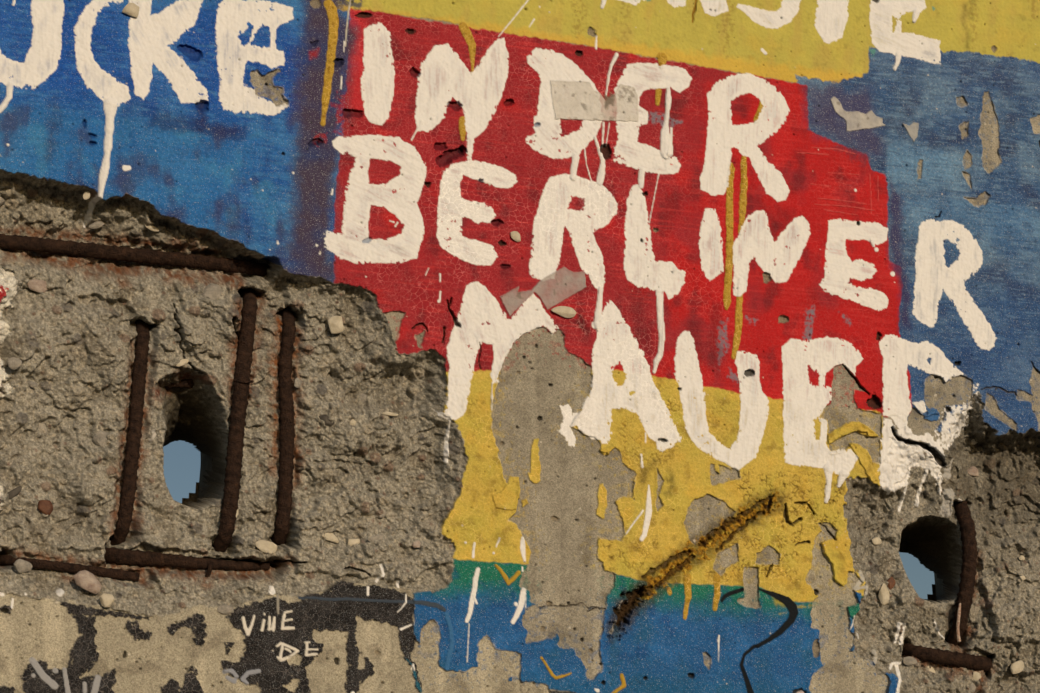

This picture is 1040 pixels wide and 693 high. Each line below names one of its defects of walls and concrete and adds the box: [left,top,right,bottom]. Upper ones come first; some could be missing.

peeling [960,92,1002,207]
peeling [1030,115,1040,147]
rust [0,225,222,256]
rust [2,248,306,541]
spalling [0,170,637,693]
crack [891,426,947,468]
peeling [656,470,664,512]
peeling [684,464,740,546]
spalling [793,365,1040,693]
rust [2,546,297,590]
peeling [713,544,780,609]
rust [901,655,999,693]